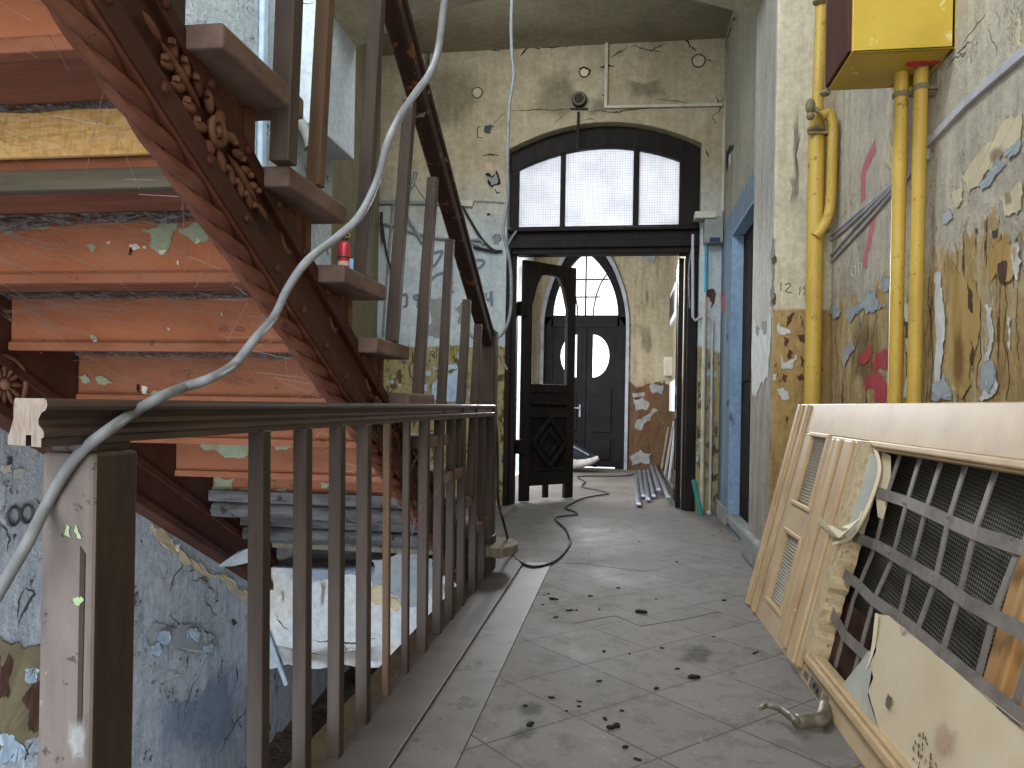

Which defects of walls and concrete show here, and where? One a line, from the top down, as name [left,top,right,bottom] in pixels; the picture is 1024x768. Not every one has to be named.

crack [492,46,569,56]
crack [600,40,696,68]
crack [946,15,997,69]
crack [495,94,688,123]
peeling [942,111,1023,224]
peeling [751,238,805,400]
peeling [931,228,1021,402]
peeling [424,353,459,402]
peeling [632,384,664,430]
crack [0,524,11,551]
crack [17,588,36,626]
peeling [0,639,40,765]